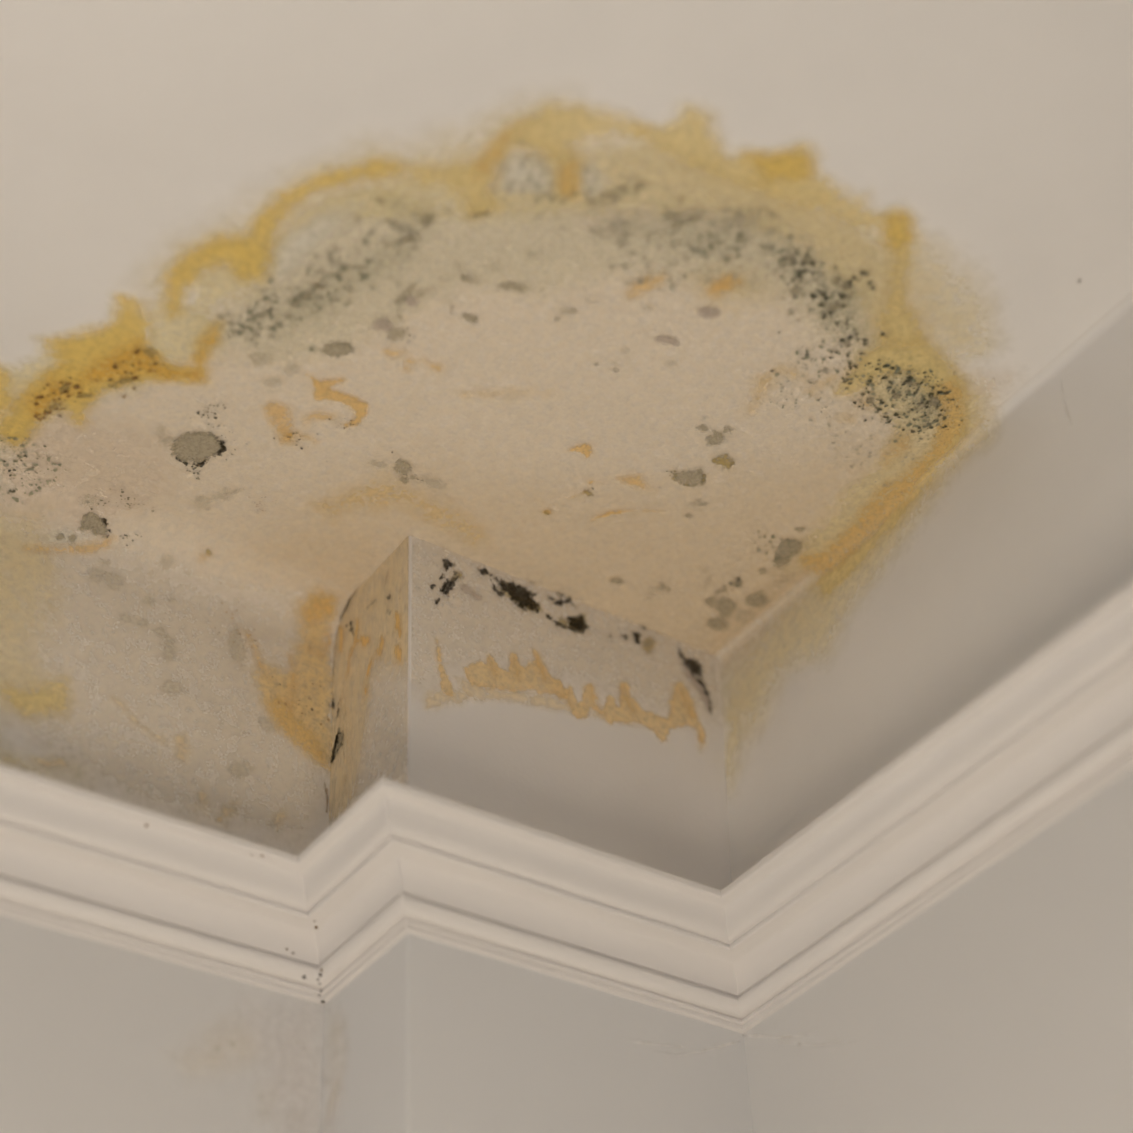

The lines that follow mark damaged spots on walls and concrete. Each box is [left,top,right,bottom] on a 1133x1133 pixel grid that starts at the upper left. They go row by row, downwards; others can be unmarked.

damp [0,108,973,809]